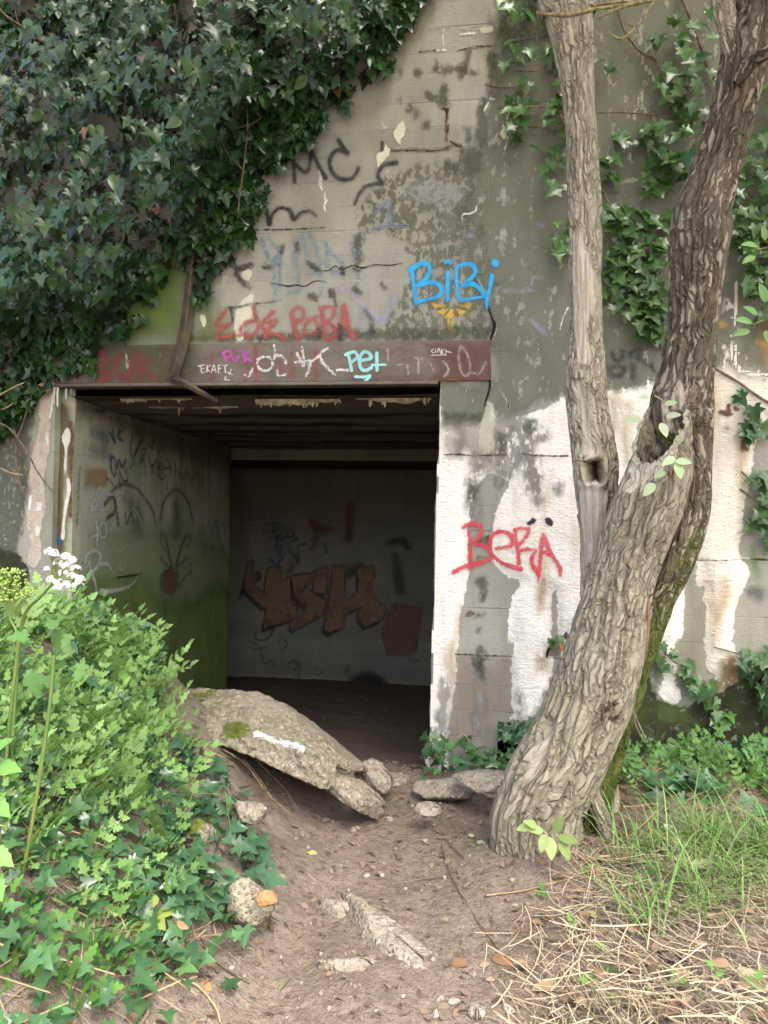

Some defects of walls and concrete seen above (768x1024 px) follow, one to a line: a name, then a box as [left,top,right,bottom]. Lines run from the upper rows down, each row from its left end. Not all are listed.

crack [273,263,402,287]
damp [593,0,721,486]
damp [249,0,581,770]
peeling [25,391,71,569]
spalling [546,645,563,659]